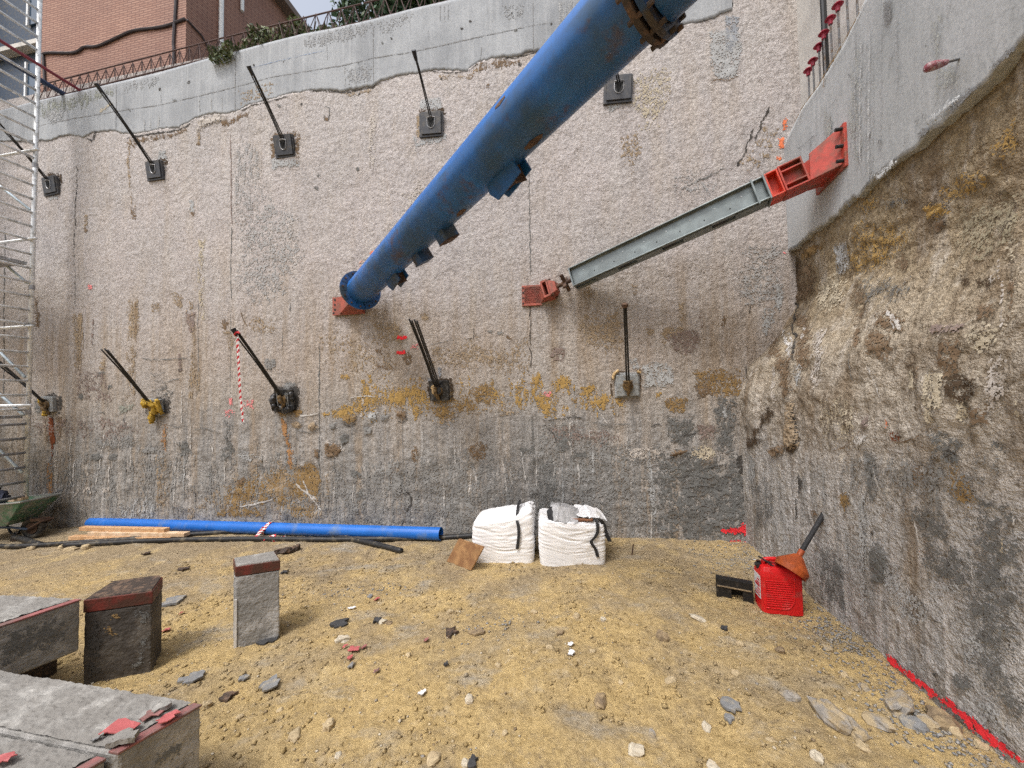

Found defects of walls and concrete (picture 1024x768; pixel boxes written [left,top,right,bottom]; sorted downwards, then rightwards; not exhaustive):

crack [688,108,769,186]
rust [46,416,55,494]